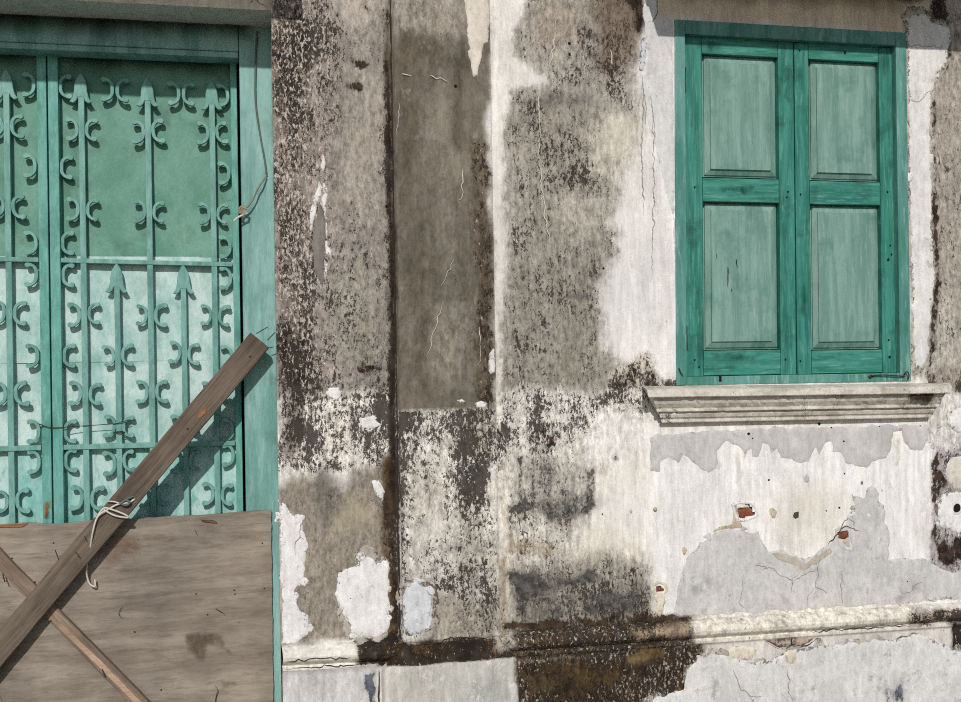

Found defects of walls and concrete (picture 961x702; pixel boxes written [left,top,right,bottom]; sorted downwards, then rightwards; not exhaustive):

peeling [464,0,490,77]
crack [641,75,656,270]
leakage [613,368,666,389]
leakage [529,420,560,450]
leakage [508,456,595,530]
spalling [731,501,777,531]
spalling [834,525,854,552]
leakage [503,569,691,630]
spalling [650,581,668,595]